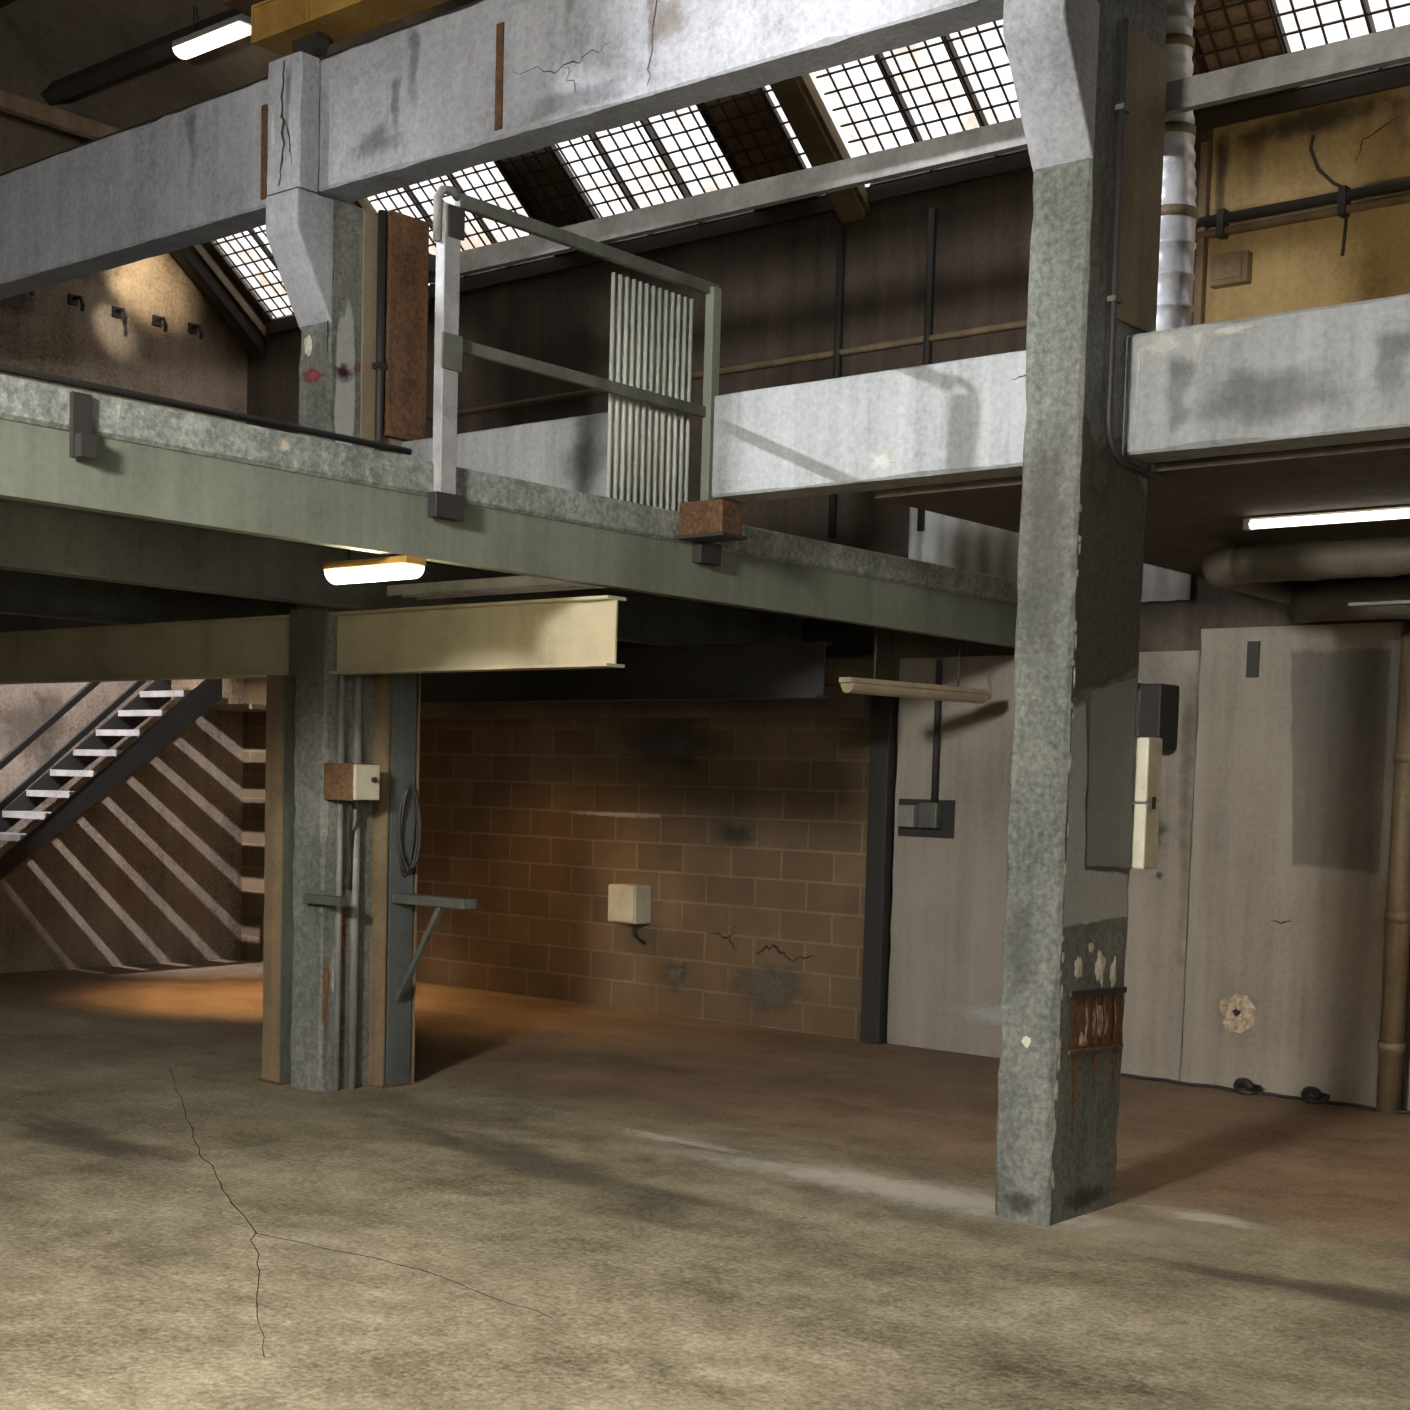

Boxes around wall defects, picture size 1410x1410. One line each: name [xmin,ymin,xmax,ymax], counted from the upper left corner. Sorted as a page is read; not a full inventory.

crack [647,0,657,85]
peeling [1054,413,1145,1101]
crack [707,926,815,962]
spalling [1220,993,1257,1034]
crack [170,1068,553,1358]